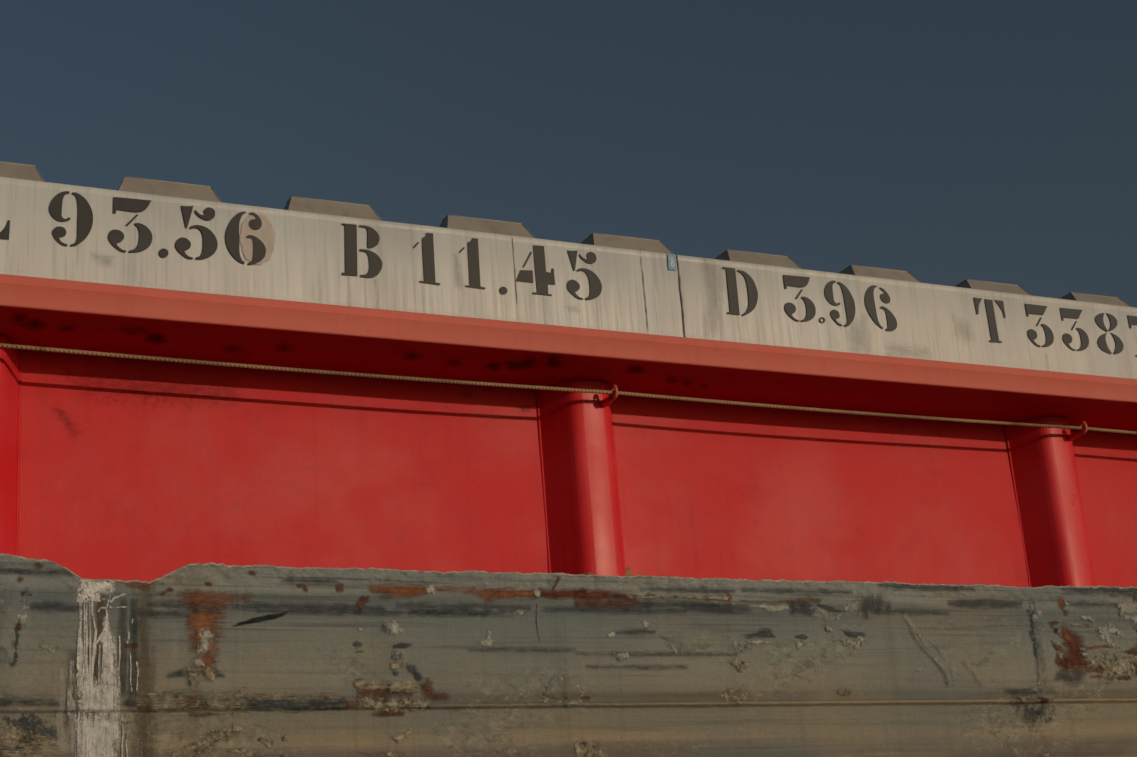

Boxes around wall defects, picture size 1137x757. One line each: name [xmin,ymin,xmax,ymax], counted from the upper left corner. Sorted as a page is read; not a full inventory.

spalling [0,699,60,757]
leakage [0,569,190,757]
corrosion [161,582,247,674]
peeling [136,620,447,757]
corrosion [357,577,732,609]
corrosion [1049,598,1111,682]